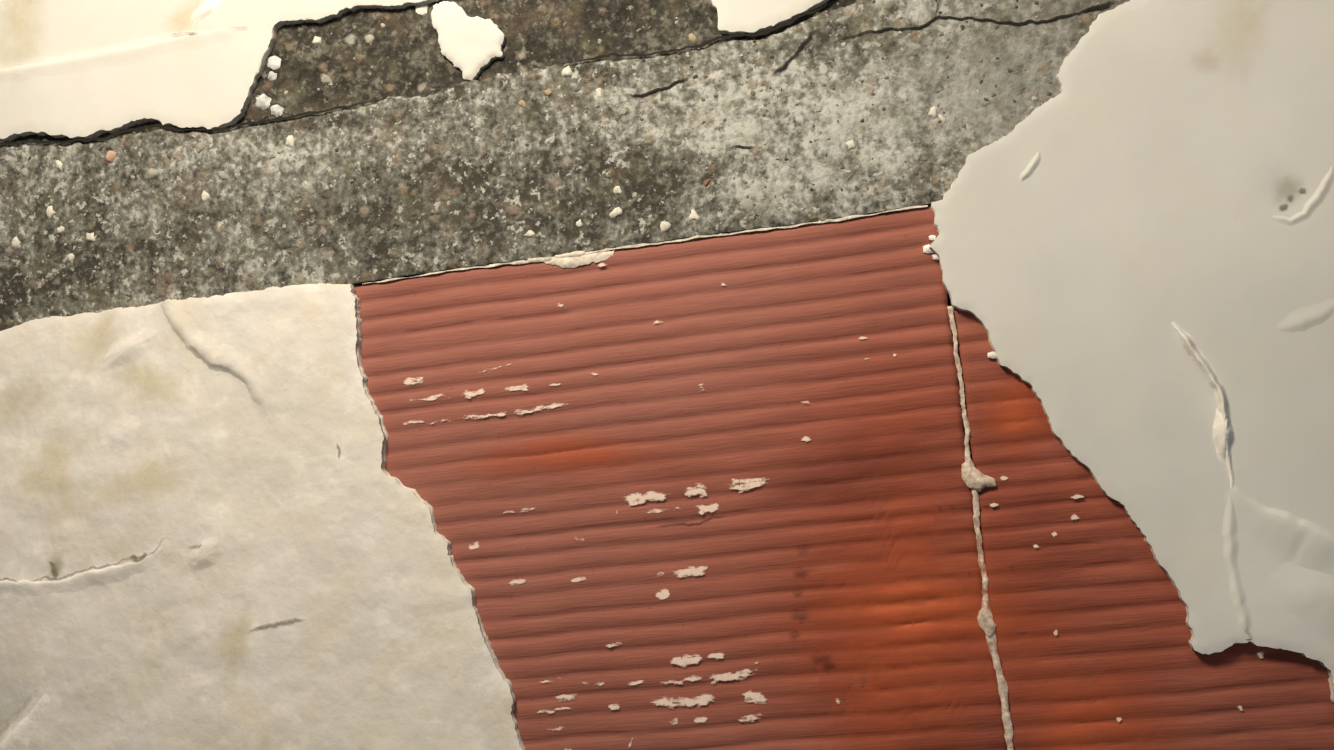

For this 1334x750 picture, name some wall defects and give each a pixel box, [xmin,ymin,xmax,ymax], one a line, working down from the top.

flaking render [0,0,438,144]
flaking render [718,0,829,36]
crack [561,1,1113,97]
flaking render [923,183,1193,649]
crack [0,547,162,597]
flaking render [352,284,526,750]